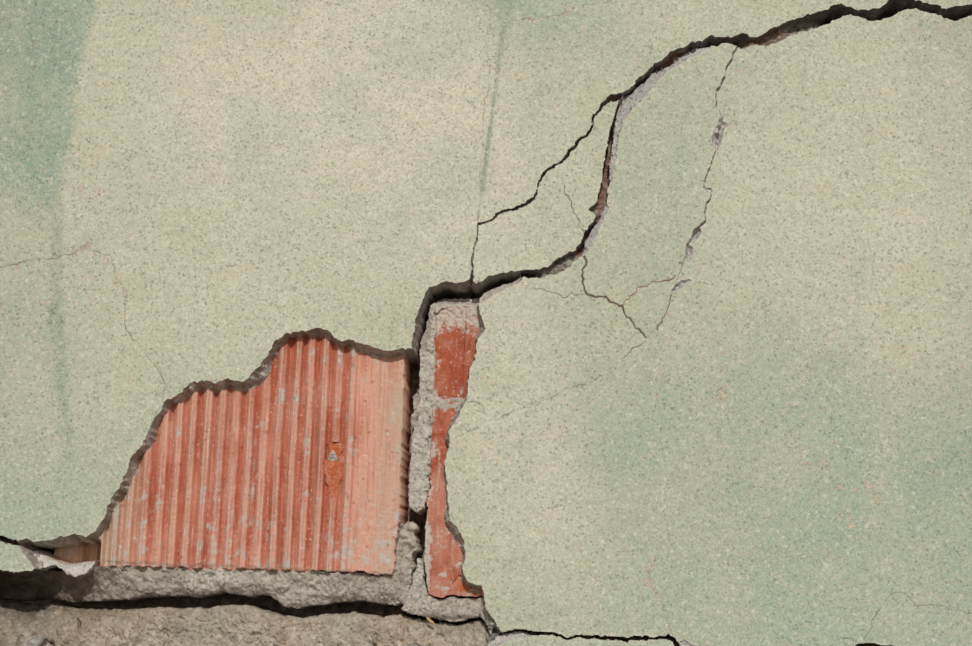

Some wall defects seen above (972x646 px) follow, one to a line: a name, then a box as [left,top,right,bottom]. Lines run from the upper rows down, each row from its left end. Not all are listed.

crack [469,0,972,338]
crack [0,536,21,545]
flaking render [0,270,531,646]
crack [1,594,712,646]
crack [407,364,427,559]
crack [855,638,892,646]